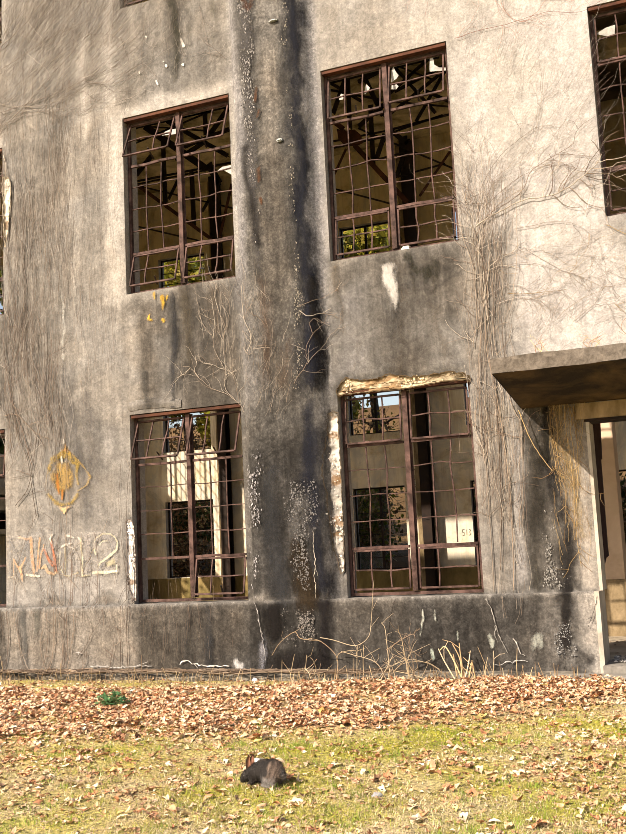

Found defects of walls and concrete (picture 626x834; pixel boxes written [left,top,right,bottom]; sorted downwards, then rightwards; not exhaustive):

spalling [2,177,11,247]
leakage [286,0,329,388]
spalling [336,371,471,397]
spalling [125,519,137,603]
leakage [260,401,333,670]
spalling [283,410,345,591]